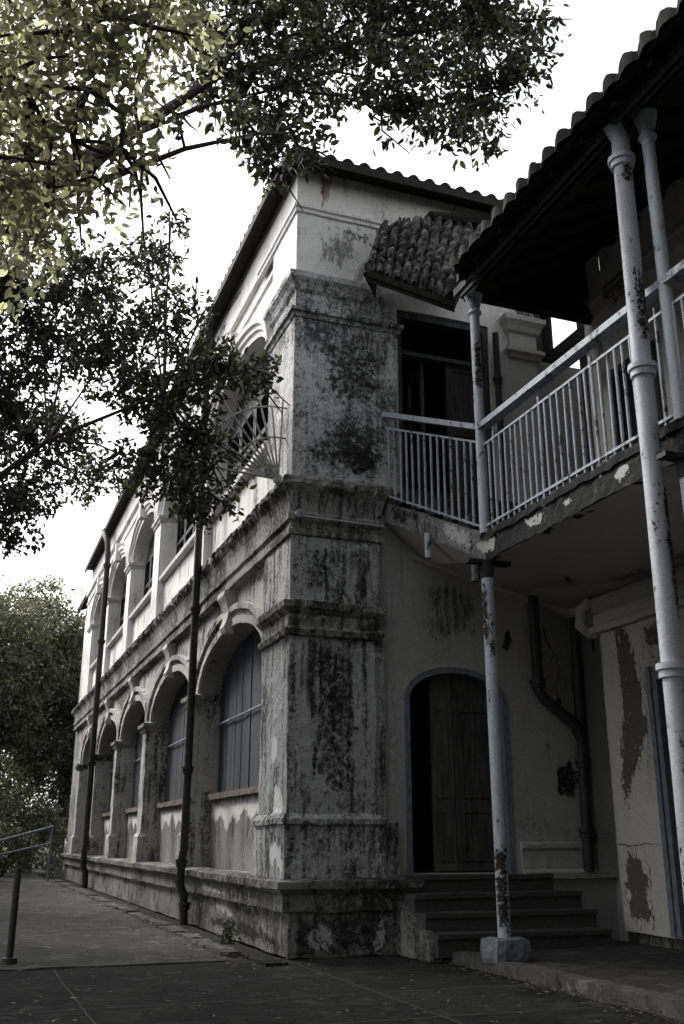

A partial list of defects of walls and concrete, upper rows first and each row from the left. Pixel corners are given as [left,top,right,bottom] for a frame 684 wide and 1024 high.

damp [323,227,371,267]
mould [317,334,388,406]
mould [309,423,386,478]
spalling [614,464,629,483]
spalling [443,522,495,553]
spalling [524,512,544,527]
damp [301,639,366,804]
flaking render [612,620,659,810]
flaking render [556,759,579,799]
flaking render [624,843,655,930]
damp [295,911,389,952]